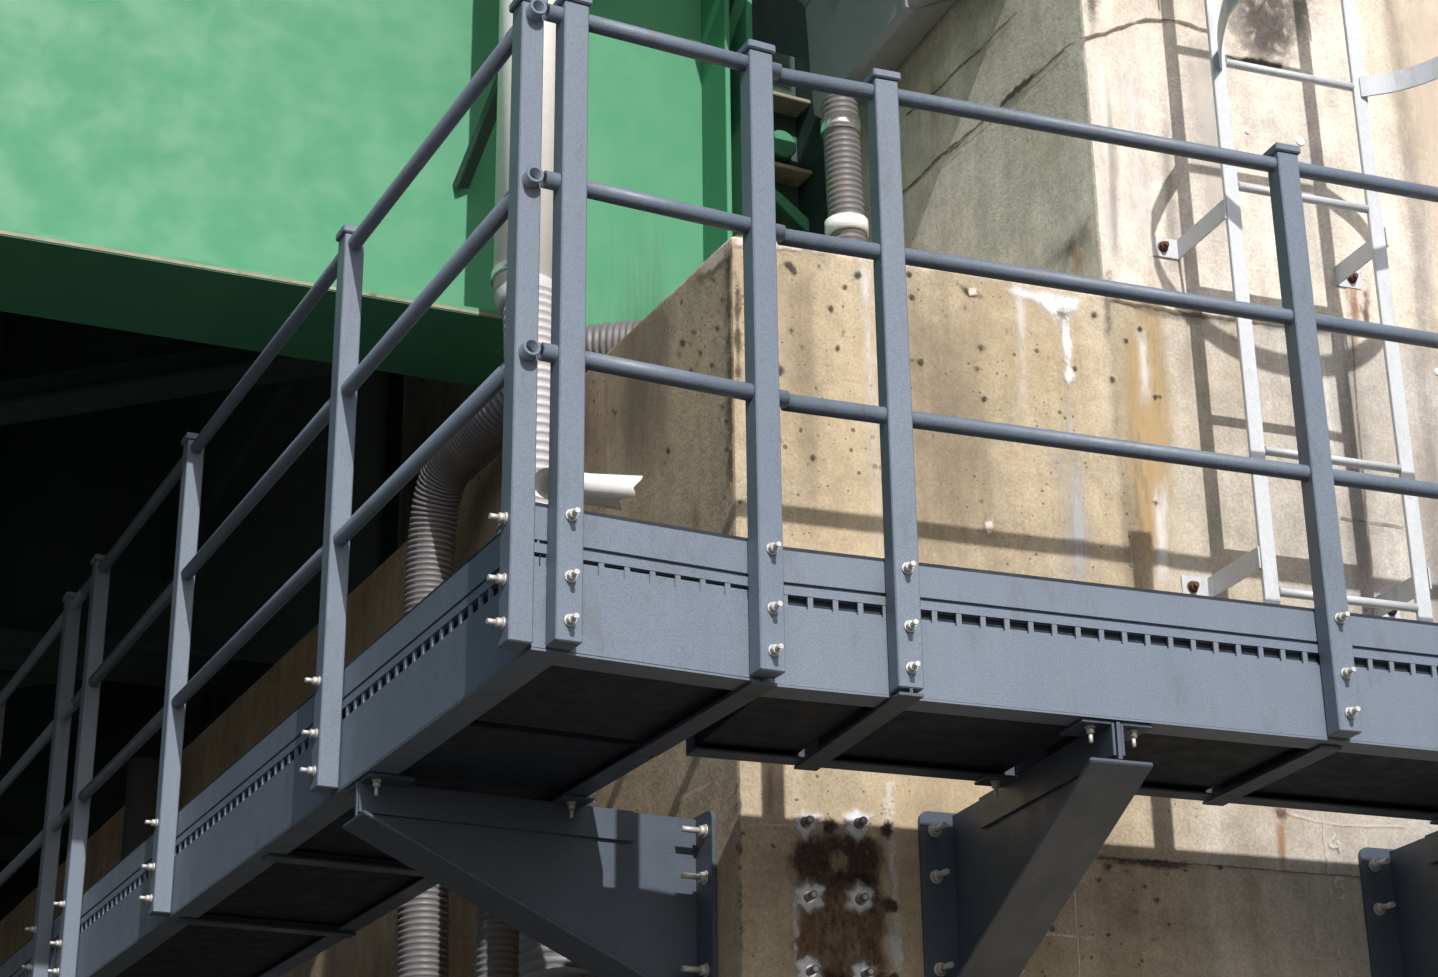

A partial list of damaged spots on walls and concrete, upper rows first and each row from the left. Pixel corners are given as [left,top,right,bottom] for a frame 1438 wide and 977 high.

crack [902,13,1207,193]
damp [1231,57,1282,69]
damp [1010,287,1080,384]
corrosion [791,818,899,977]